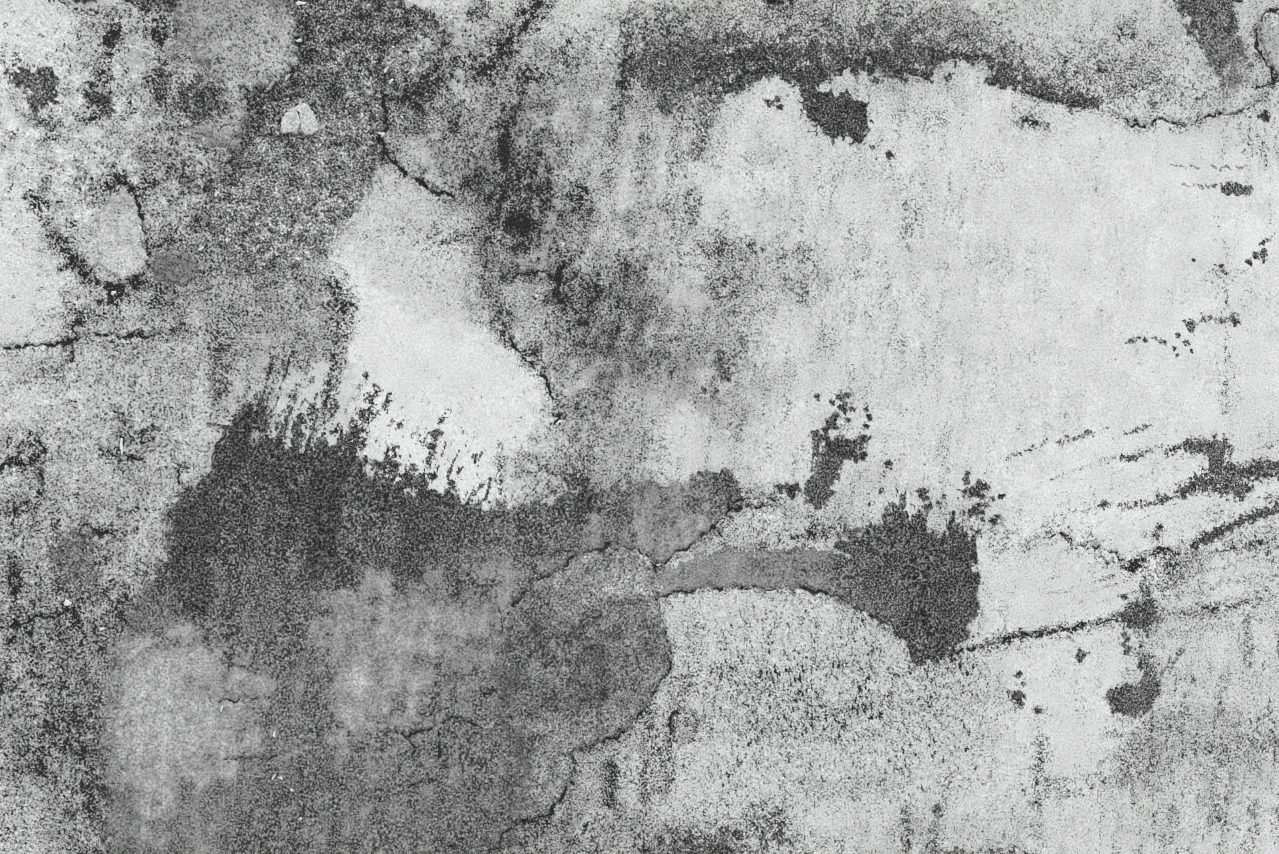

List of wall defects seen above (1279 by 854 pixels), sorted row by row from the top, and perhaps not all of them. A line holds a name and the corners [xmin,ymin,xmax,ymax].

leakage [613,0,1118,168]
crack [1025,90,1086,109]
crack [1116,8,1279,129]
leakage [1173,0,1271,122]
crack [116,182,150,255]
crack [3,323,172,373]
leakage [1081,489,1184,513]
leakage [1161,430,1238,485]
leakage [88,371,1006,854]
crack [491,493,1123,850]
leakage [1012,670,1041,714]
leakage [1097,575,1185,719]